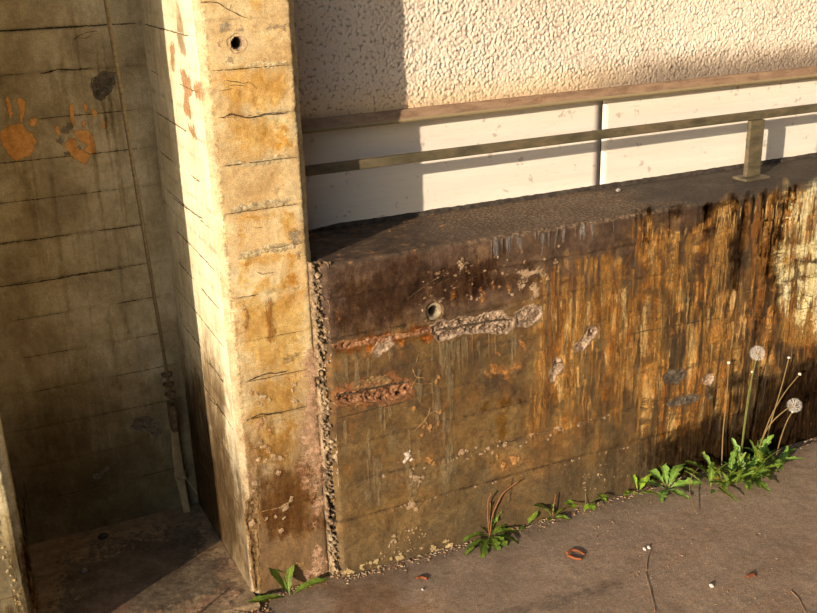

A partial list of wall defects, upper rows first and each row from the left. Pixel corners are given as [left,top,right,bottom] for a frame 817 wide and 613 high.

spalling [90,71,116,101]
damp [675,183,817,378]
rust [265,298,276,343]
spalling [572,326,599,353]
damp [640,306,670,377]
rust [485,352,522,380]
spalling [549,356,565,382]
spalling [236,230,559,592]